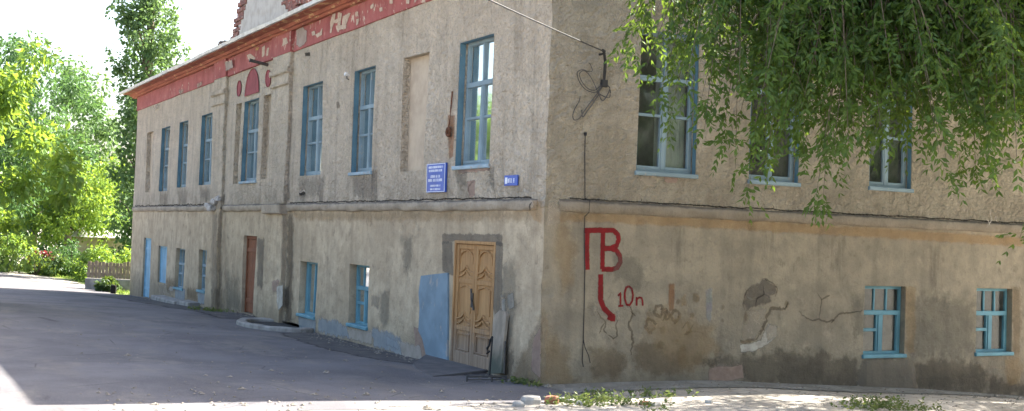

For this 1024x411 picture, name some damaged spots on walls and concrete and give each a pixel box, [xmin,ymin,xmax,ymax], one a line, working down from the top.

spalling [230,0,247,39]
spalling [281,0,312,12]
peeling [282,12,359,56]
spalling [744,279,776,309]